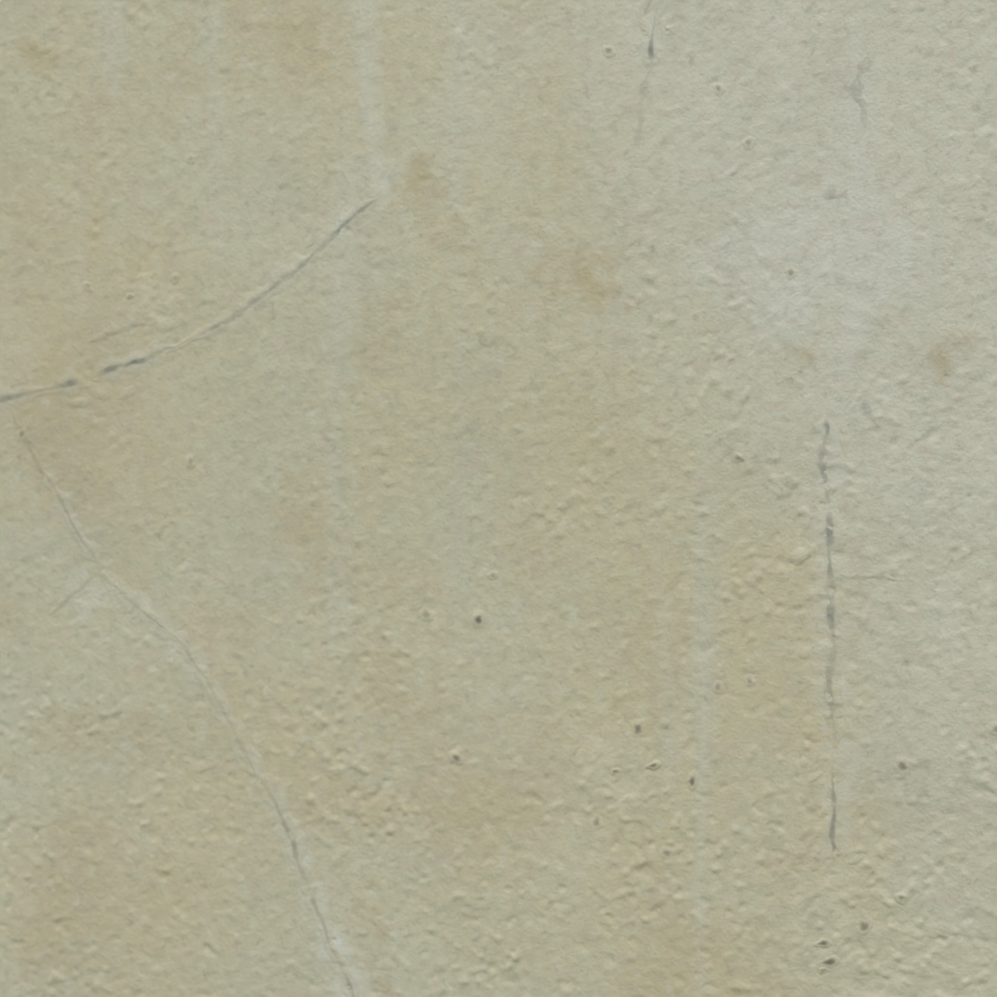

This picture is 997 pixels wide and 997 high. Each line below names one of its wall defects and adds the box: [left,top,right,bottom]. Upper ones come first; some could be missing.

crack [632,0,677,146]
crack [0,197,378,475]